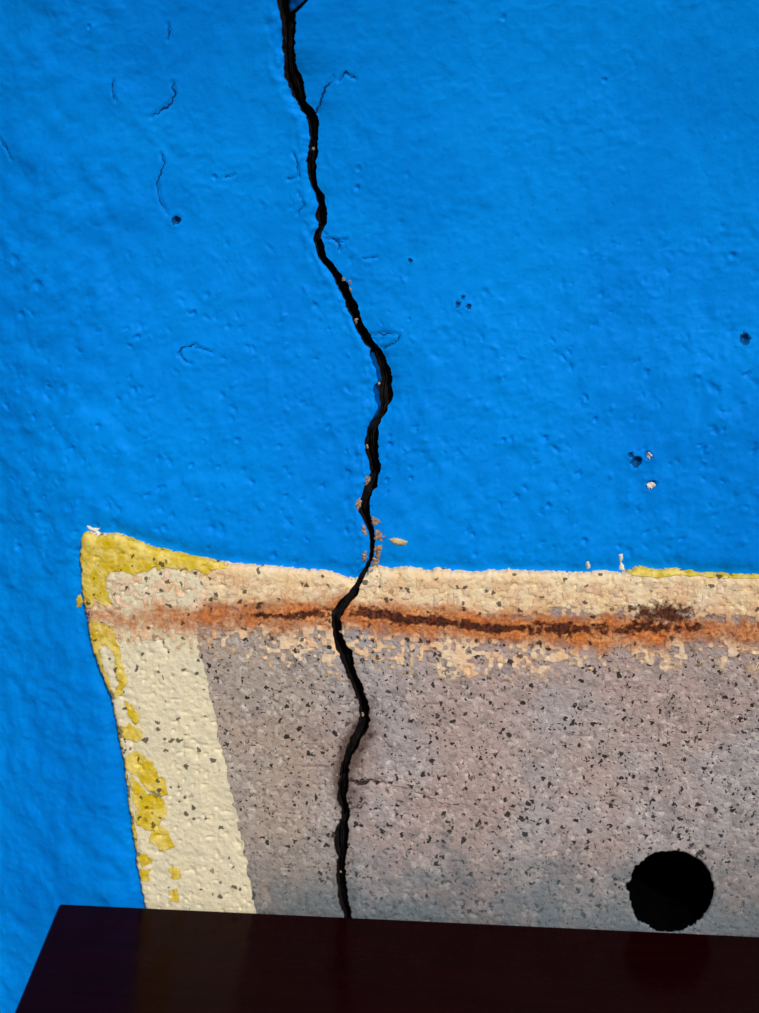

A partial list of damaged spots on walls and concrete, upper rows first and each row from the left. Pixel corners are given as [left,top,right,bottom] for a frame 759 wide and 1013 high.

crack [277,0,459,918]
peeling [76,526,759,914]
rust [143,597,759,652]